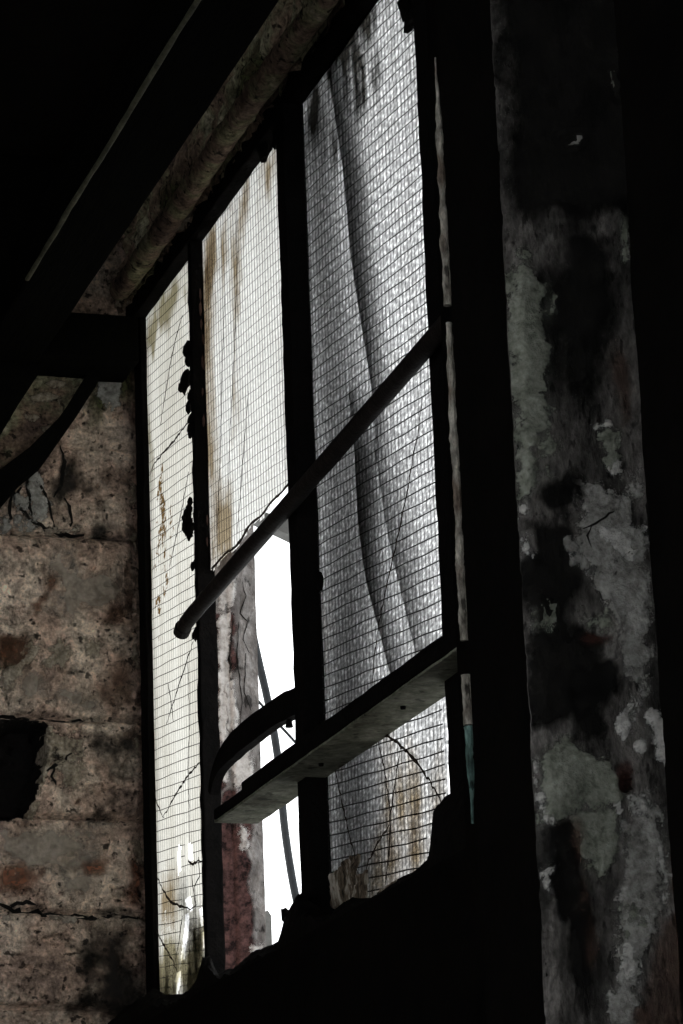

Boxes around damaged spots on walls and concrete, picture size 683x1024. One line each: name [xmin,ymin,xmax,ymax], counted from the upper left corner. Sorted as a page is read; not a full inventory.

crack [8,445,84,538]
flaking render [505,248,558,515]
flaking render [531,599,557,633]
crack [583,511,615,547]
flaking render [563,419,665,764]
crack [0,642,202,971]